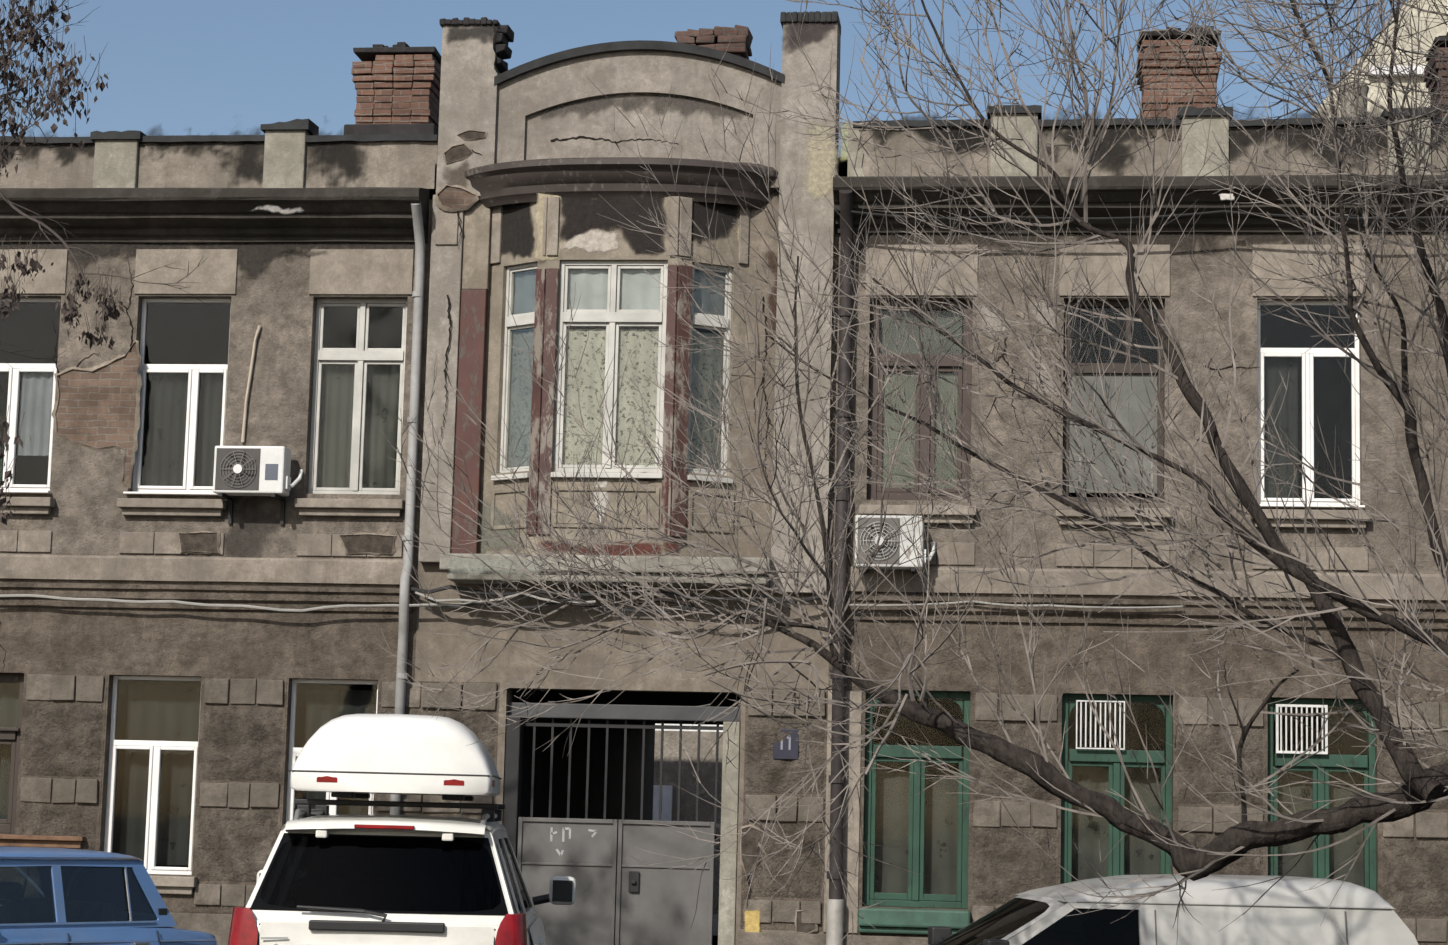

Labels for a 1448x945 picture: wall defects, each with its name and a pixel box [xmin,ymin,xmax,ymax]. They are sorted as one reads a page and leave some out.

flaking render [442,129,488,165]
crack [550,136,678,152]
flaking render [435,183,479,249]
peeling [535,193,618,260]